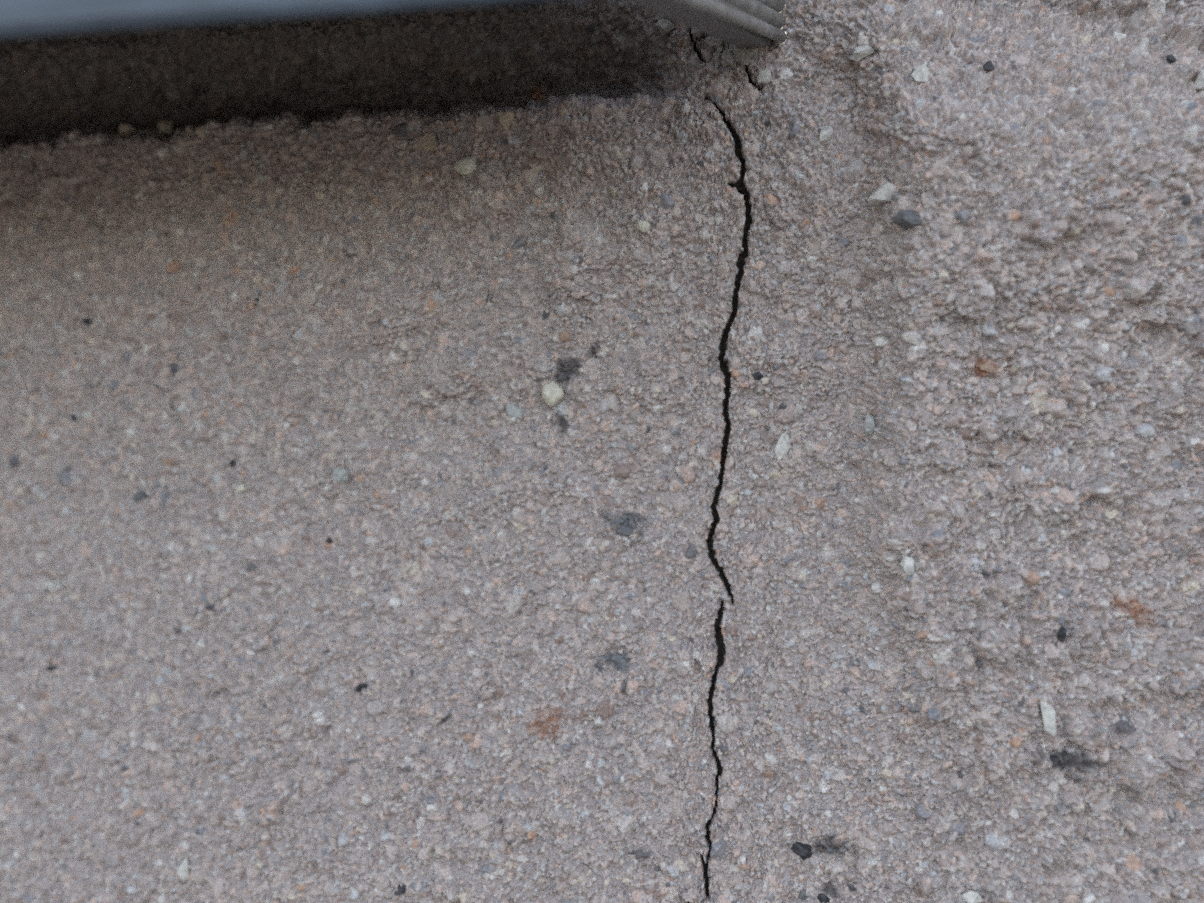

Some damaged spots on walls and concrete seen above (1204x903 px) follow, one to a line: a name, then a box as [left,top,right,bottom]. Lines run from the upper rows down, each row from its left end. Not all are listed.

crack [690,31,705,63]
crack [701,98,752,900]